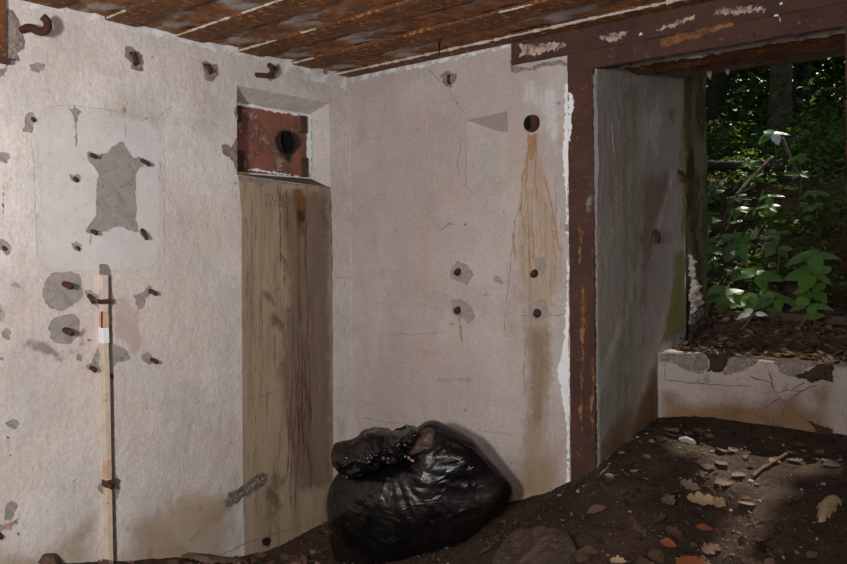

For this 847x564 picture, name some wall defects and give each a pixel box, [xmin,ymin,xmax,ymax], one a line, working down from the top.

peeling [0,1,567,91]
rust [660,22,738,47]
spalling [86,142,144,237]
rust [512,135,537,261]
spalling [42,271,99,344]
spalling [76,343,130,375]
spalling [658,353,710,382]
spalling [723,357,756,375]
crack [664,362,817,424]
spalling [225,472,267,507]